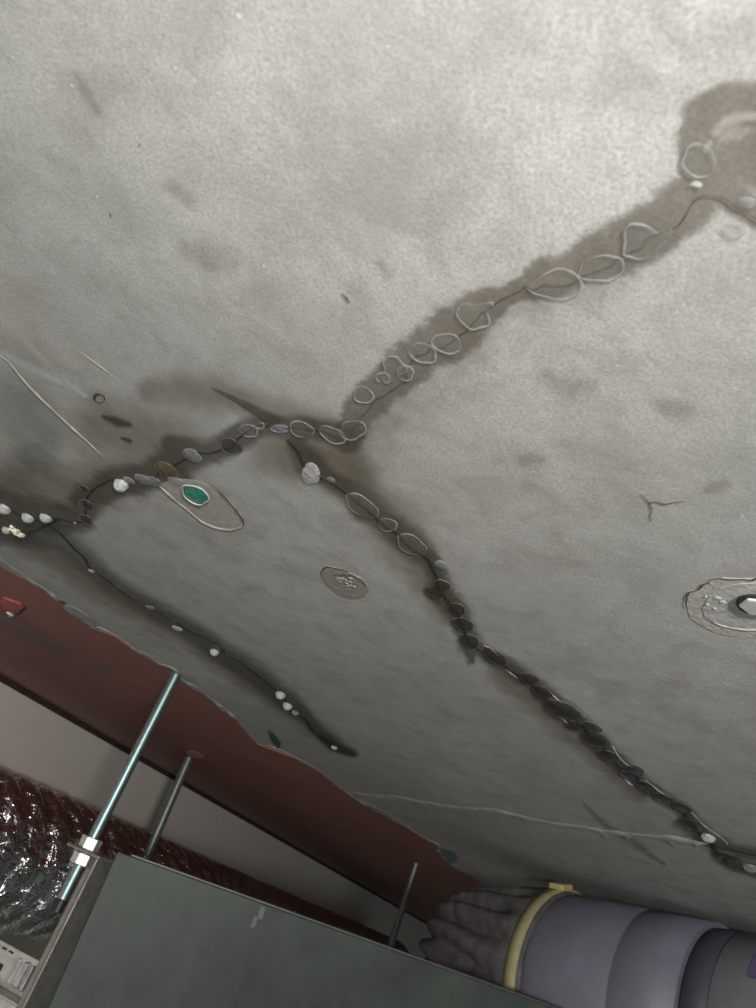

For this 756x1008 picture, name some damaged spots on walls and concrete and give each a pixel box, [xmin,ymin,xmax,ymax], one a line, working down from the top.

water stain [0,87,756,875]
crack [0,195,756,872]
spalling [321,566,369,600]
peeling [0,597,27,617]
peeling [268,729,281,749]